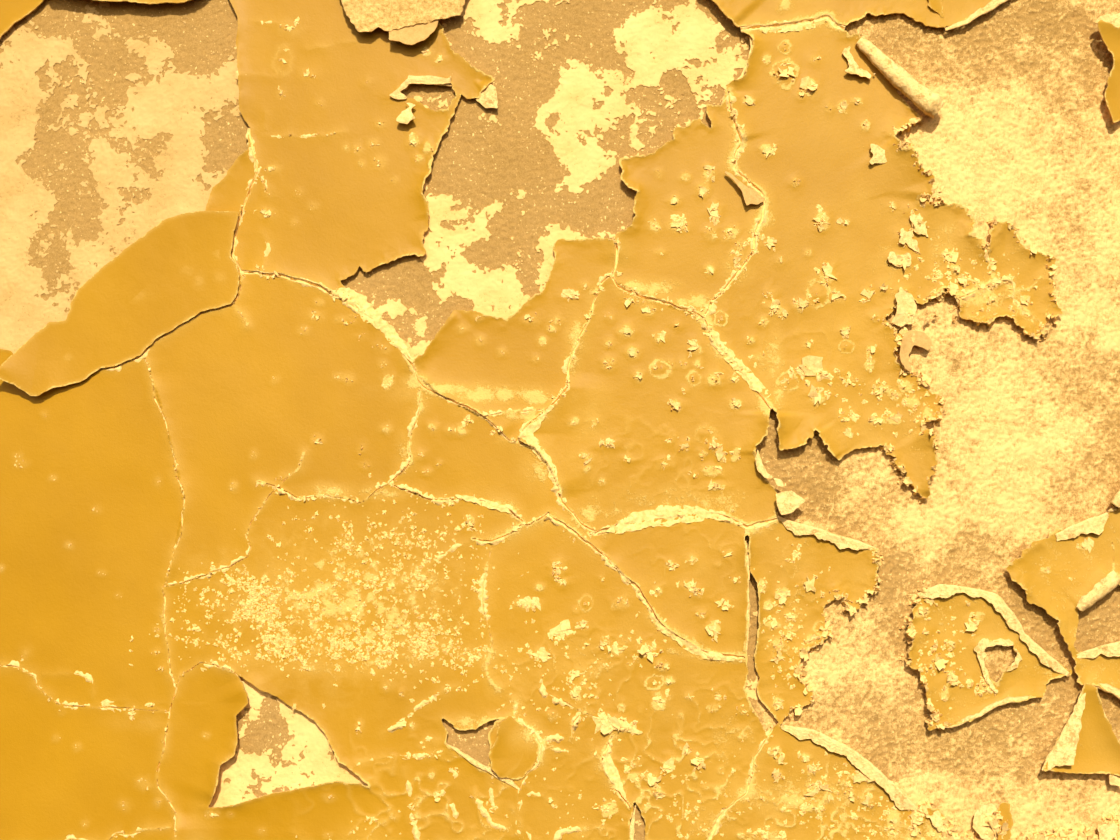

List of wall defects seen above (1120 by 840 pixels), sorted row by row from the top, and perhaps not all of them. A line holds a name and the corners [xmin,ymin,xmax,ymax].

peeling [0,0,250,396]
peeling [341,0,753,359]
crack [0,92,778,840]
peeling [744,0,1120,840]
peeling [209,677,368,808]
peeling [442,715,539,791]